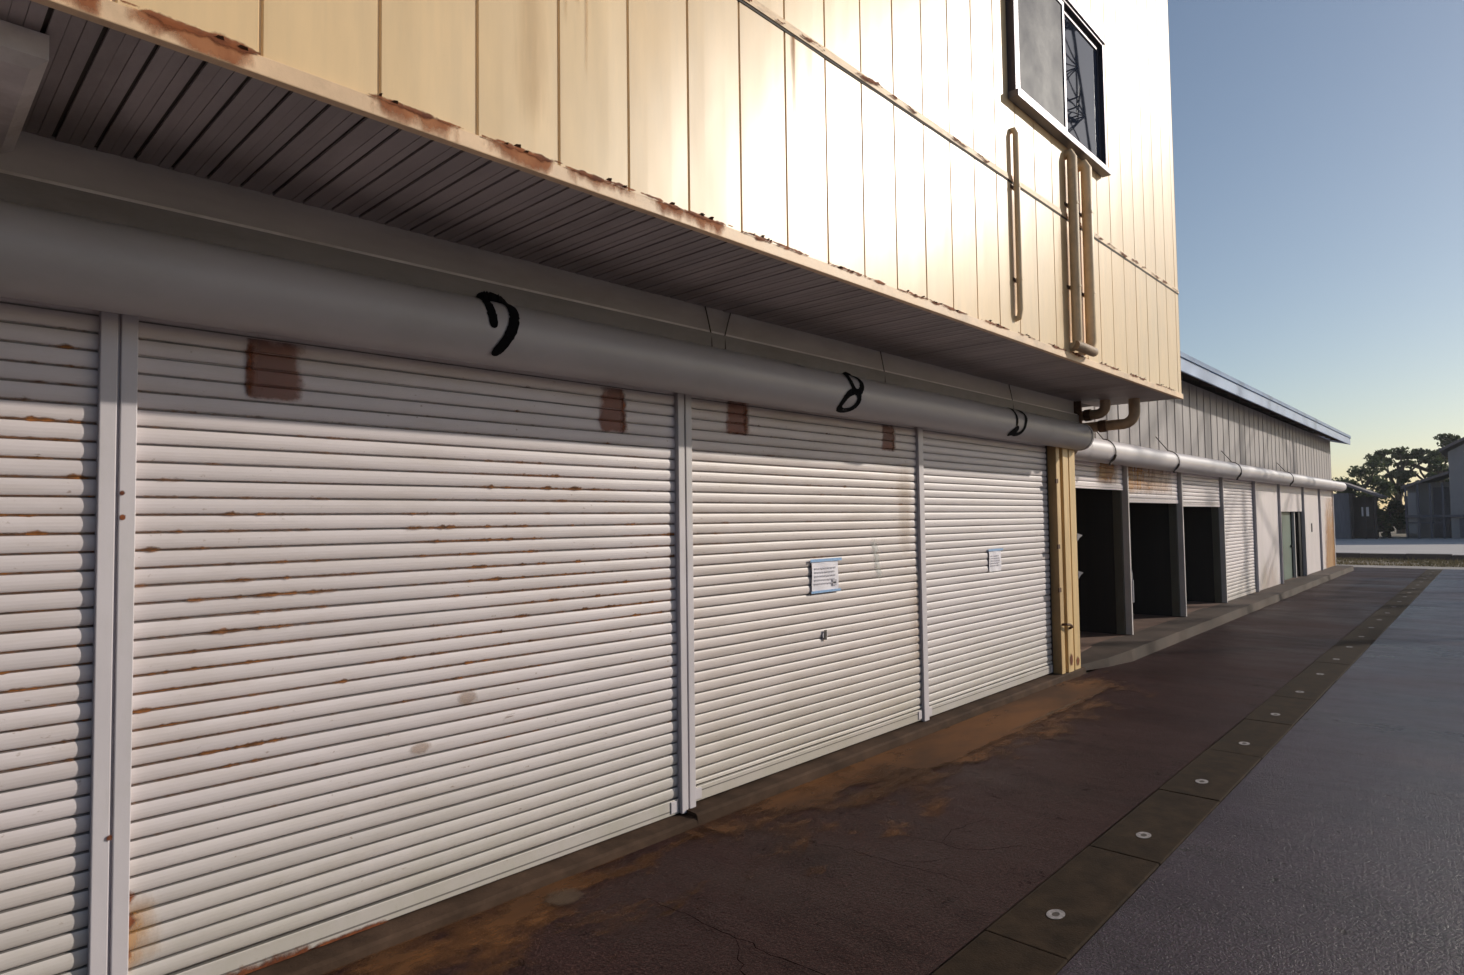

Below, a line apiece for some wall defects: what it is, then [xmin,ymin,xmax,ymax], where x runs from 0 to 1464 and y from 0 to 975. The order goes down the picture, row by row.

corrosion [120,0,260,65]
corrosion [370,93,461,133]
corrosion [857,72,917,114]
corrosion [482,135,809,256]
corrosion [828,262,1175,391]
corrosion [599,388,626,444]
corrosion [726,401,759,435]
corrosion [0,398,96,571]
corrosion [0,589,92,708]
corrosion [132,497,381,785]
corrosion [369,460,675,750]
crack [644,898,825,975]